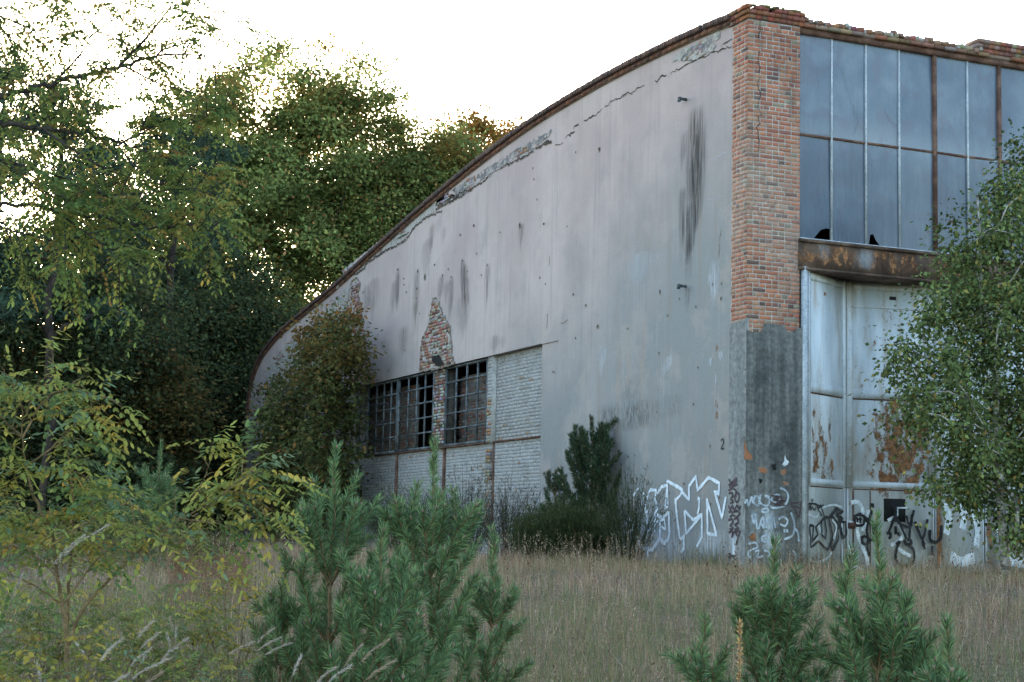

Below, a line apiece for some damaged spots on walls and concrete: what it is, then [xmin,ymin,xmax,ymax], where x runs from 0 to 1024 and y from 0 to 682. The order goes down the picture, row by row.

crack [755,20,763,150]
crack [353,39,732,275]
damp [680,116,703,252]
flaking render [264,129,553,402]
rust [798,246,963,278]
rust [812,407,834,480]
rust [866,399,929,498]